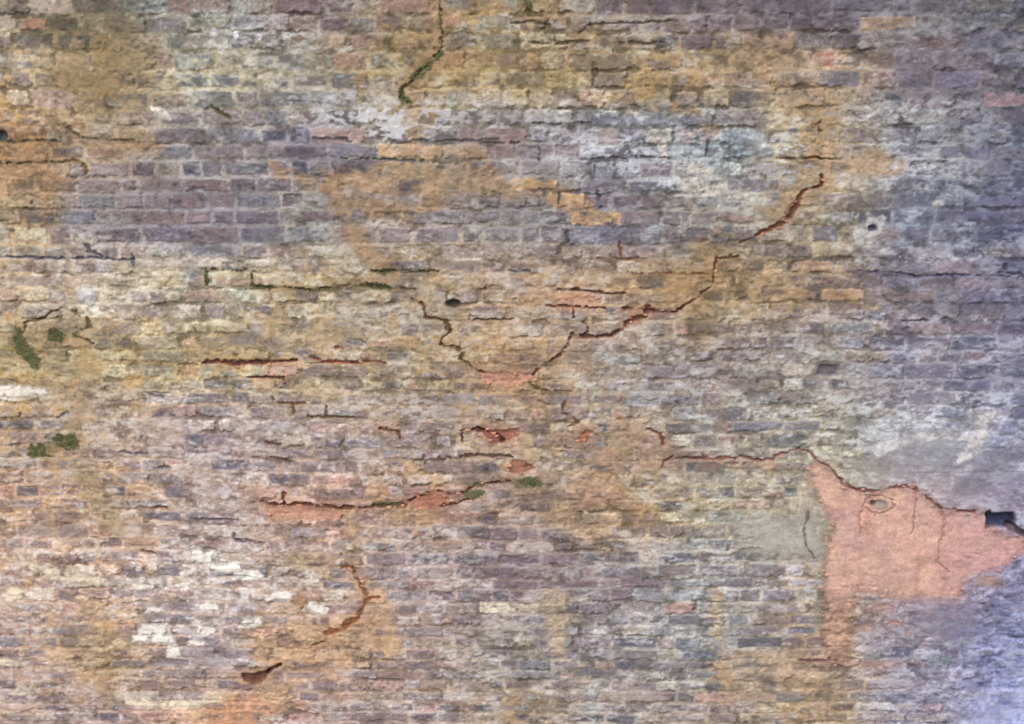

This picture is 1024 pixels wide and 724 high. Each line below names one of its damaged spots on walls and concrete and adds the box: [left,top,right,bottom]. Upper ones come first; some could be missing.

crack [399,0,444,103]
crack [205,267,485,373]
crack [527,122,835,427]
crack [202,346,401,439]
crack [260,426,513,510]
crack [312,565,381,646]
spalling [805,463,1024,667]